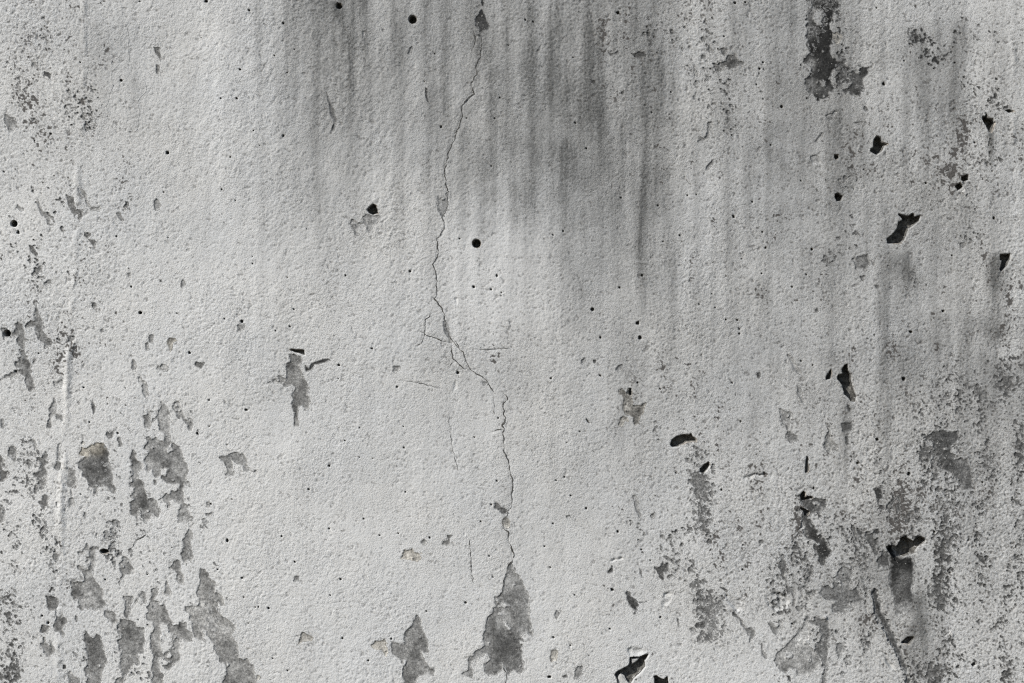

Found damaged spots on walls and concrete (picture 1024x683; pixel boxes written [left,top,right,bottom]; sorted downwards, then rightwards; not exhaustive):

peeling [800,0,870,142]
leakage [241,0,1024,474]
peeling [268,354,330,427]
crack [416,30,514,683]
peeling [0,359,260,683]
peeling [634,350,1024,683]
peeling [371,615,434,683]
peeling [462,563,533,677]
spalling [627,645,647,664]